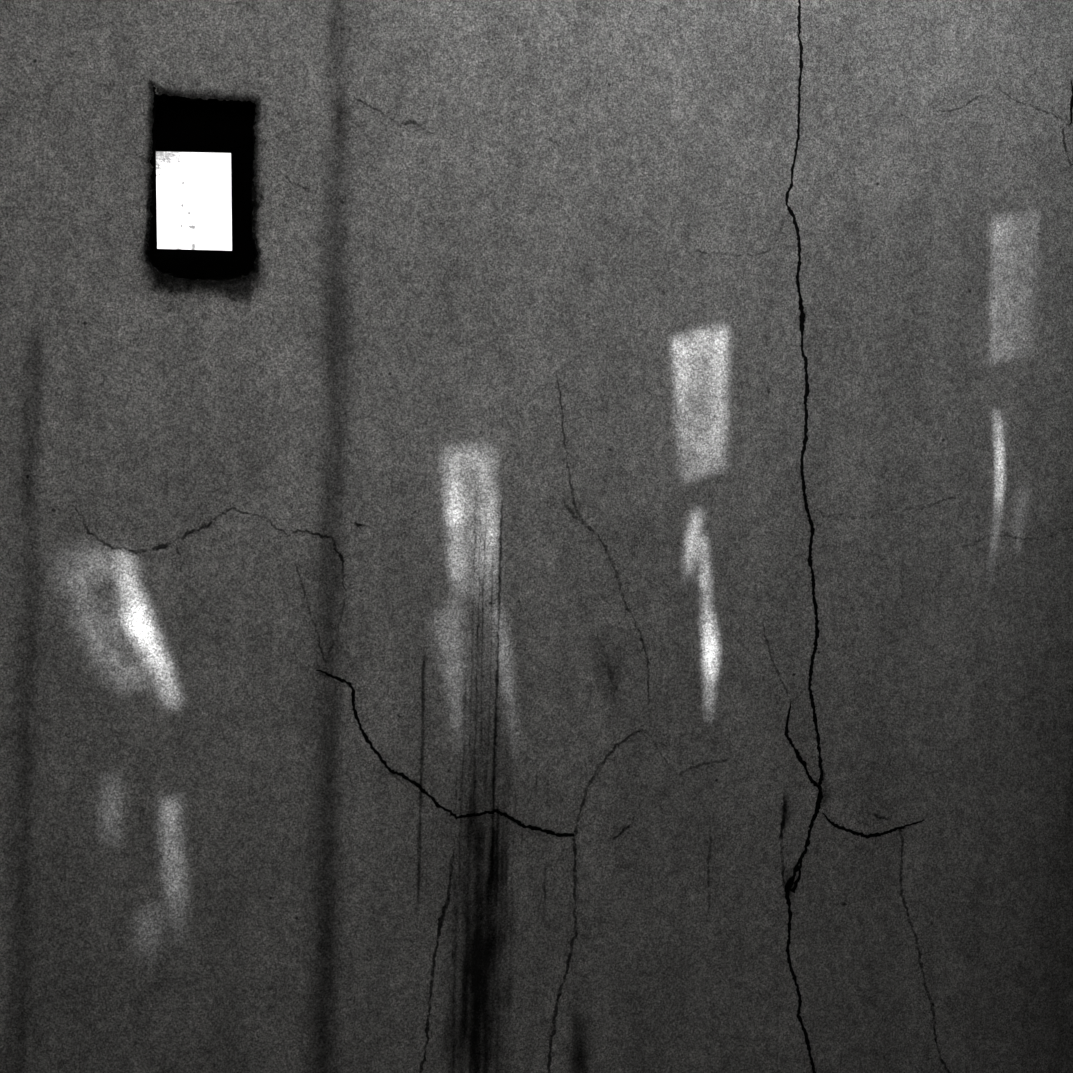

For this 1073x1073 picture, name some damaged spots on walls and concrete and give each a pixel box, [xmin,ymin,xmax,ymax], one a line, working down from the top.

crack [1002,80,1073,166]
crack [75,507,364,604]
crack [556,372,650,698]
crack [700,0,950,1073]
crack [316,644,642,1073]
crack [660,752,727,775]